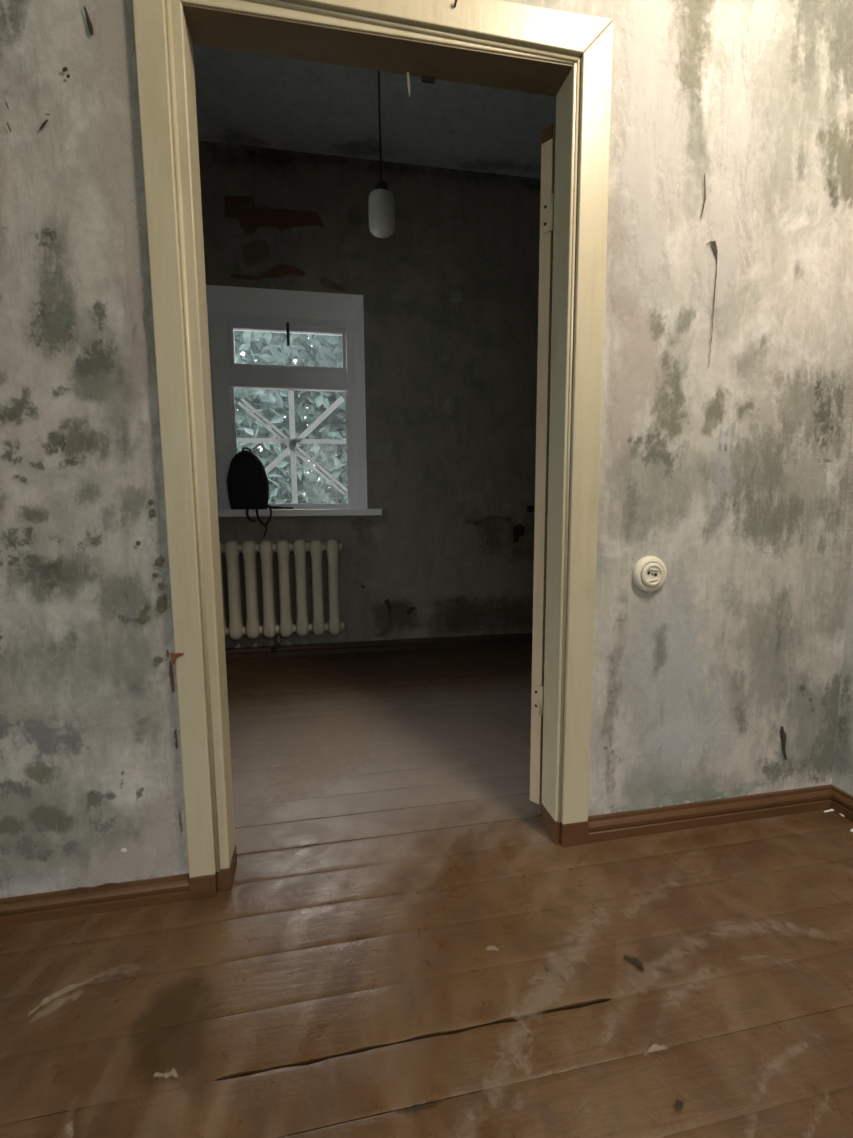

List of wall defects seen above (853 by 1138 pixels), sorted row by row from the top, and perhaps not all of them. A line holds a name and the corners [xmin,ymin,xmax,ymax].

leakage [820,120,853,206]
spalling [224,195,324,236]
leakage [76,302,117,374]
leakage [0,389,37,424]
leakage [1,420,93,483]
leakage [630,354,684,477]
leakage [705,367,773,487]
leakage [814,381,833,461]
leakage [0,508,64,587]
leakage [618,677,849,812]
leakage [0,710,81,862]
leakage [87,771,124,833]